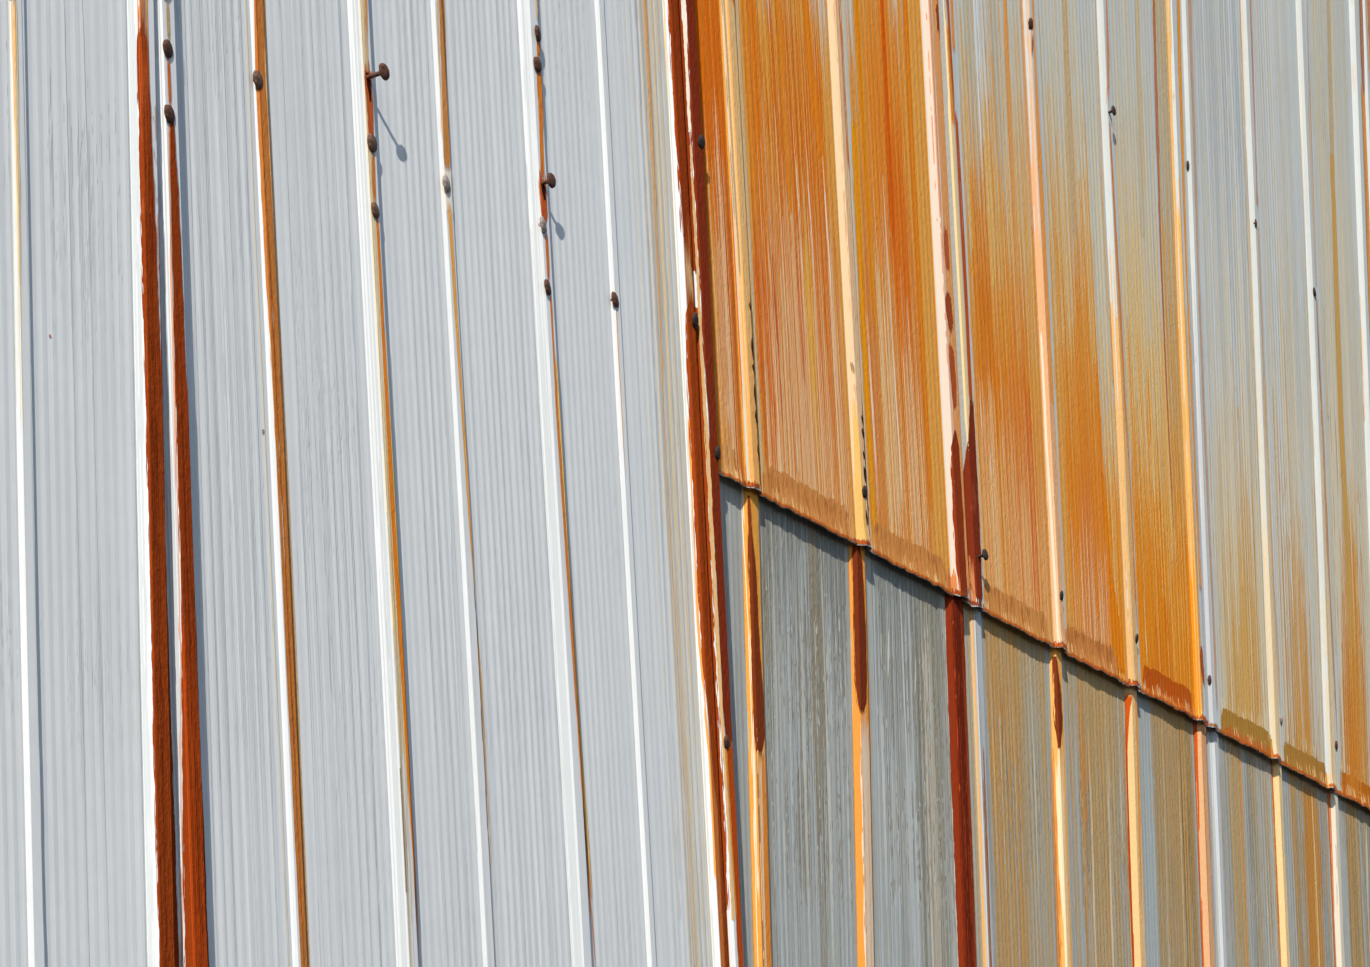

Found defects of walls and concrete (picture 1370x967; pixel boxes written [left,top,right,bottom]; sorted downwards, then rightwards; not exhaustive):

rust [137,0,209,967]
rust [245,0,310,967]
rust [359,0,420,967]
rust [537,41,596,963]
rust [626,0,1370,967]